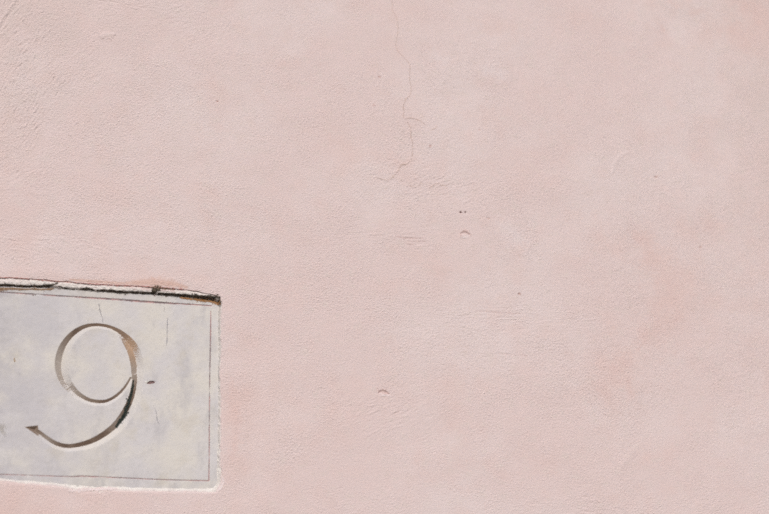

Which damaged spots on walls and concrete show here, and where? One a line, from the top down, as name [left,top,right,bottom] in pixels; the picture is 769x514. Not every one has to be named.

crack [376,0,449,189]